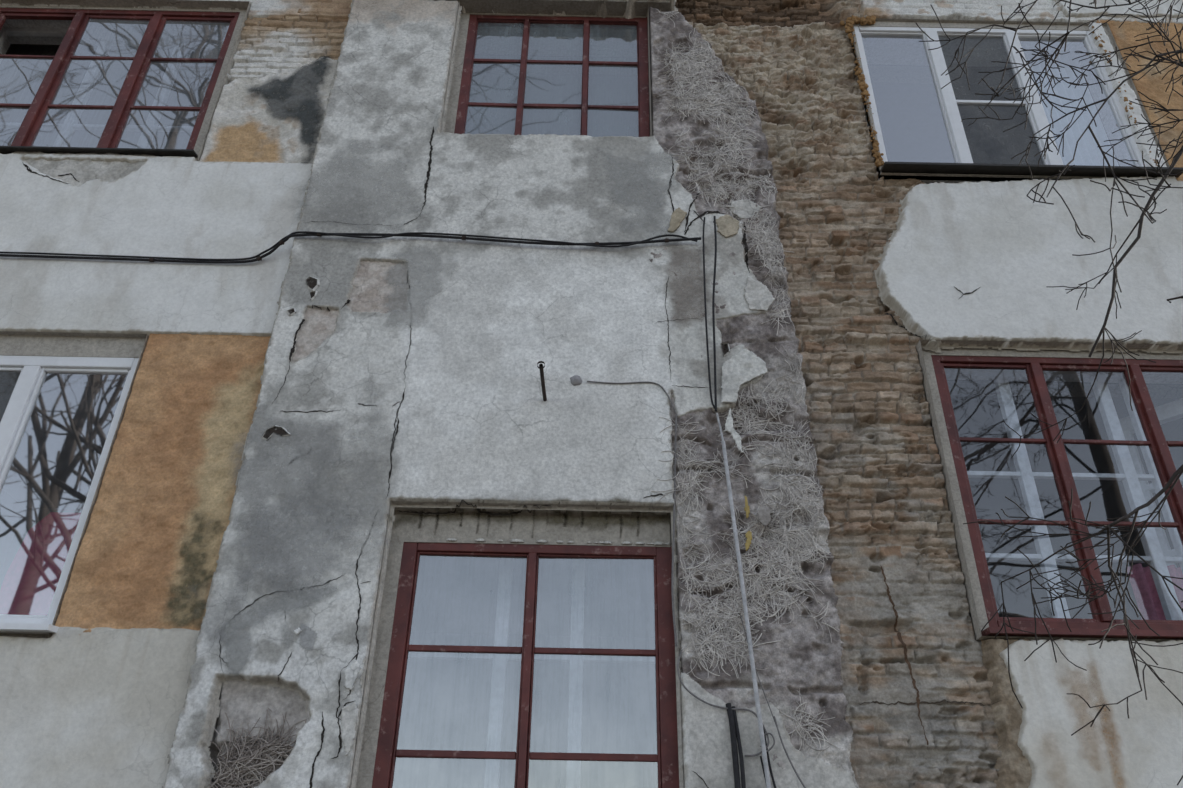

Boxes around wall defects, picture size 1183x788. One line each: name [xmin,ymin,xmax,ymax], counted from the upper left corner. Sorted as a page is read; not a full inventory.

spalling [227,5,351,83]
crack [307,127,434,226]
spalling [347,261,409,313]
spalling [647,0,1032,788]
crack [219,272,565,788]
spalling [208,680,310,788]